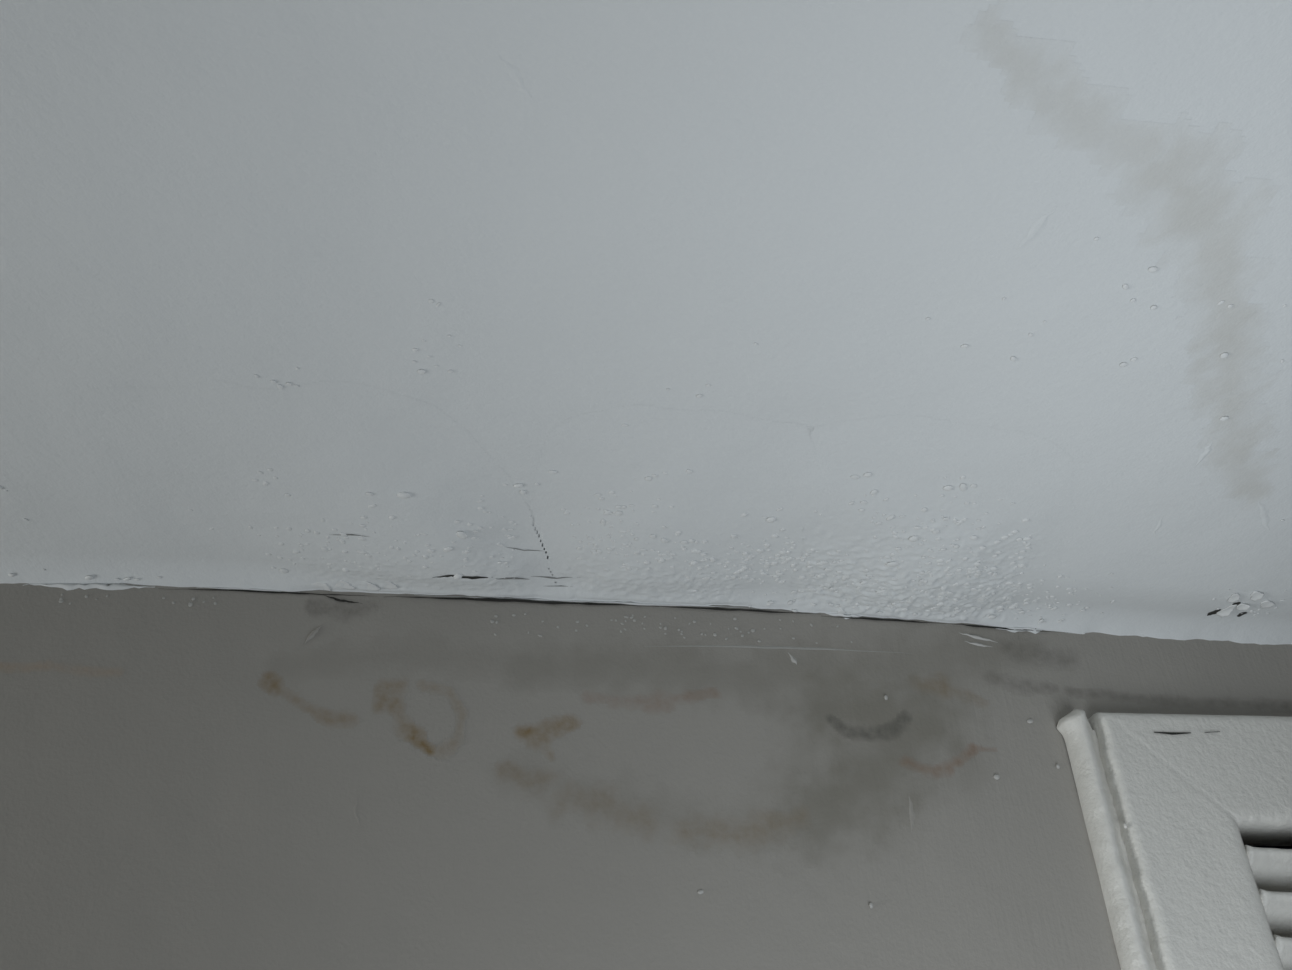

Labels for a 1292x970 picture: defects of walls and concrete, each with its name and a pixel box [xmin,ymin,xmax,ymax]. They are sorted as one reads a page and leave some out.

peeling [1207,589,1287,618]
damp [256,619,1292,901]